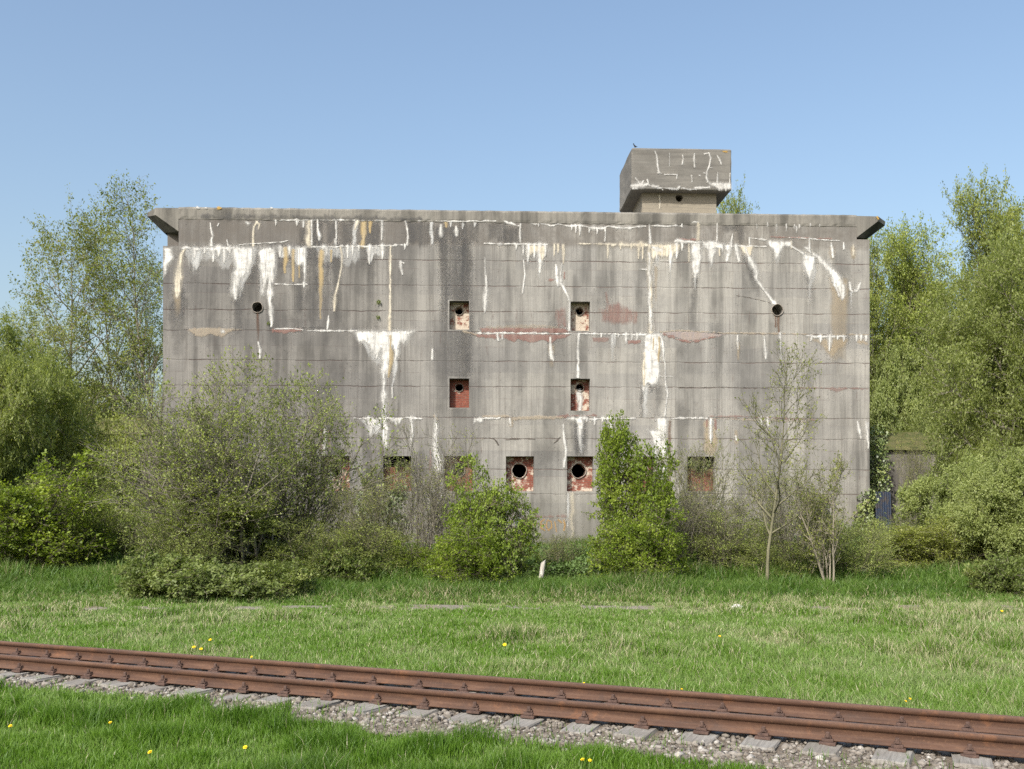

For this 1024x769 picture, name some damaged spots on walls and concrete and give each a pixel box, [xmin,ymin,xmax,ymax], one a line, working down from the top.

damp [631,153,731,209]
damp [163,207,867,500]